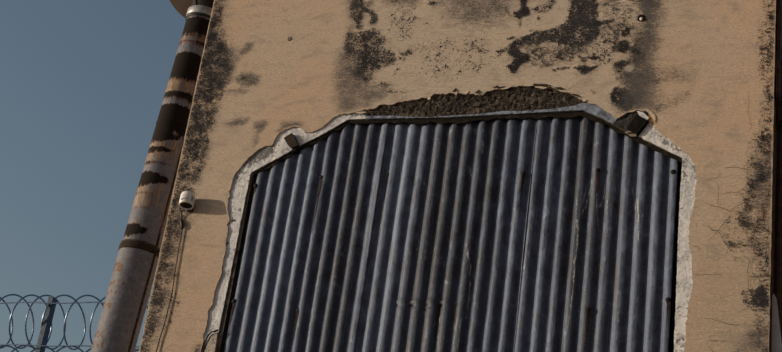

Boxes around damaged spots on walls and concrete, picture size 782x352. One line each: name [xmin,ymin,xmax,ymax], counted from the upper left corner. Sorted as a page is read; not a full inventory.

leakage [141,0,266,352]
spalling [203,84,697,352]
leakage [335,0,663,111]
crack [694,167,769,352]
leakage [723,0,775,352]